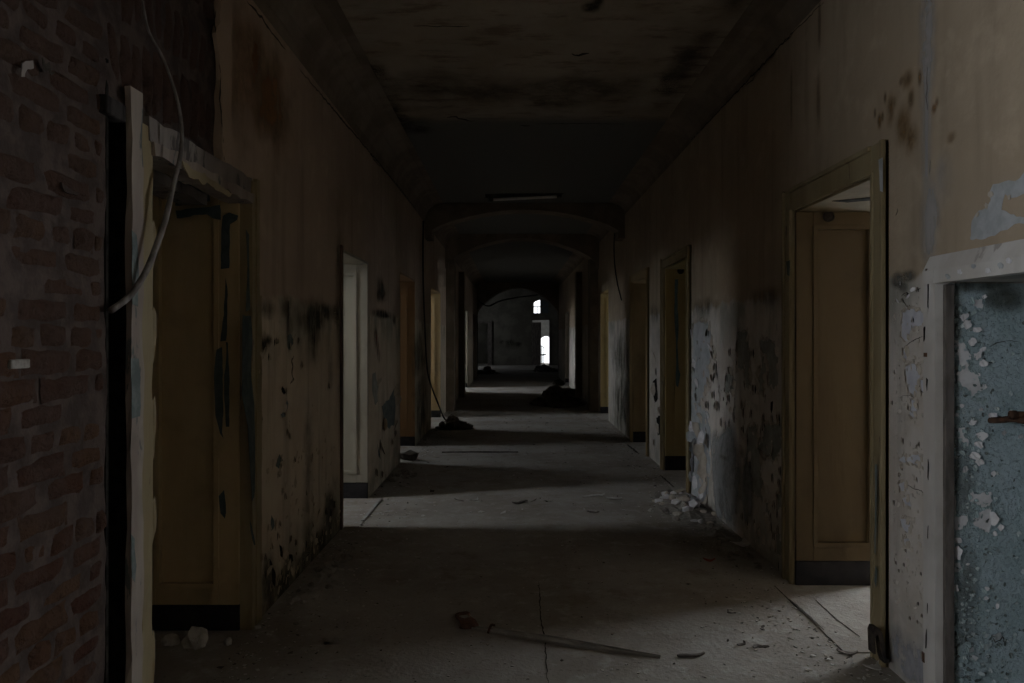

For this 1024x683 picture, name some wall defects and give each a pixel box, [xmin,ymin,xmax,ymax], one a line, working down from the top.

peeling [970,173,1024,240]
peeling [686,318,780,504]
peeling [954,294,1024,683]